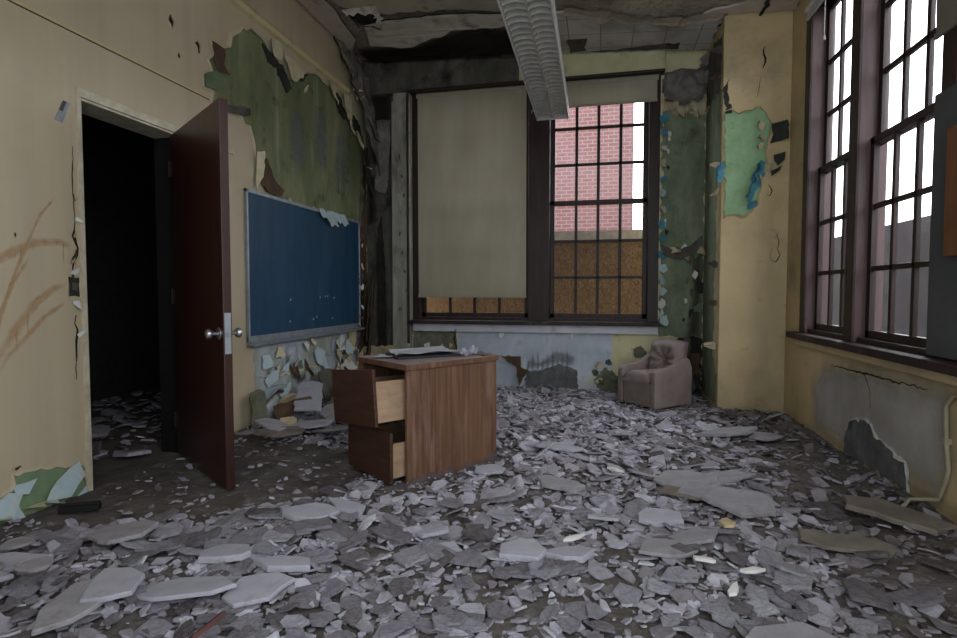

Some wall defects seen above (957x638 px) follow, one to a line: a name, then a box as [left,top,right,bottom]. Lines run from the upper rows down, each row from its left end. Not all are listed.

peeling [194,26,381,418]
peeling [556,0,801,404]
peeling [413,331,618,391]
peeling [0,461,88,525]
spalling [815,370,944,494]